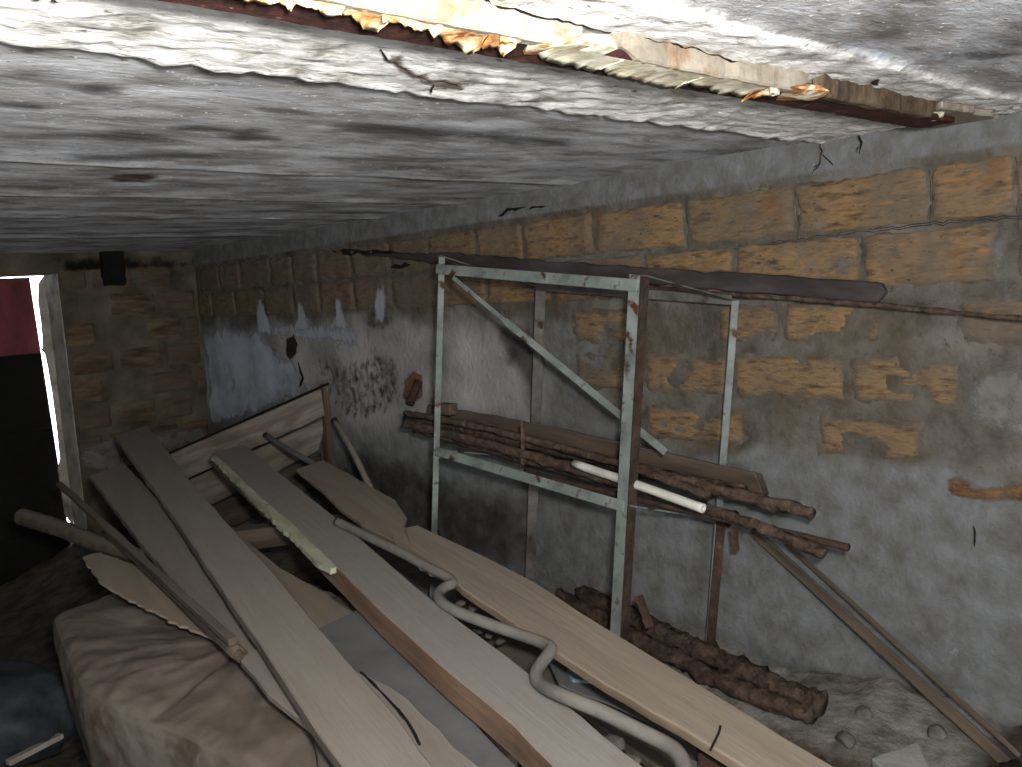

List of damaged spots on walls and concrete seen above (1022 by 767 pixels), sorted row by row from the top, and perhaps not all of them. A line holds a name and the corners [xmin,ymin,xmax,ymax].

peeling [244,0,521,57]
crack [379,49,463,93]
peeling [538,48,780,102]
crack [734,144,1022,250]